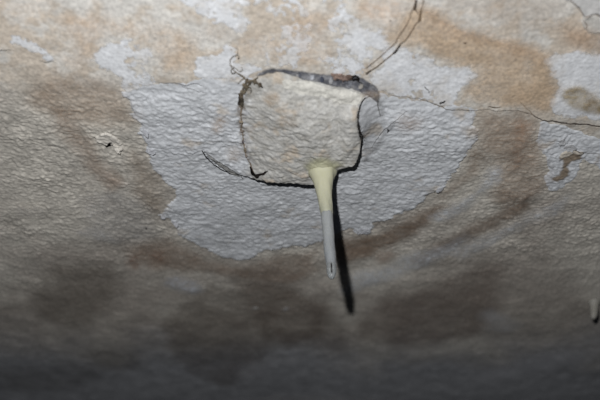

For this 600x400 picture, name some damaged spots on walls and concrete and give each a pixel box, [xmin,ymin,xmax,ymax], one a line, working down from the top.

crack [202,105,268,179]
peeling [90,0,480,260]
crack [357,94,600,148]
peeling [536,50,600,191]